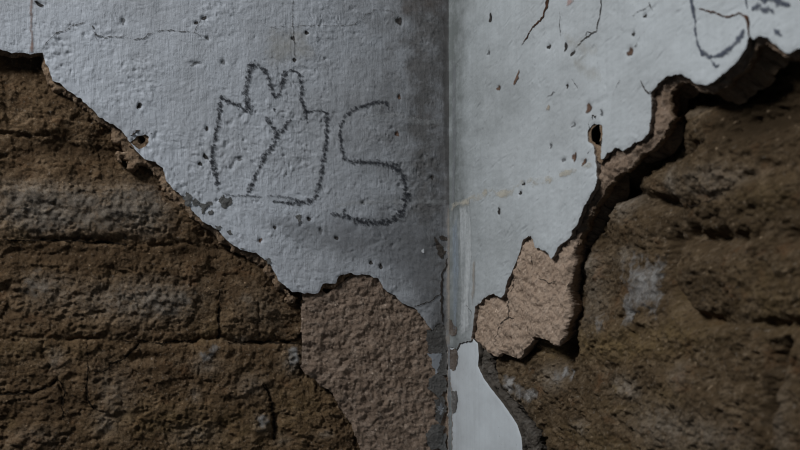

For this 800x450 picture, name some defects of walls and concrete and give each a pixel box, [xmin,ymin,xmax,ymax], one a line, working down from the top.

crack [522,0,560,44]
crack [576,0,601,47]
flaking render [0,50,448,450]
flaking render [450,37,800,450]
damp [624,269,660,319]